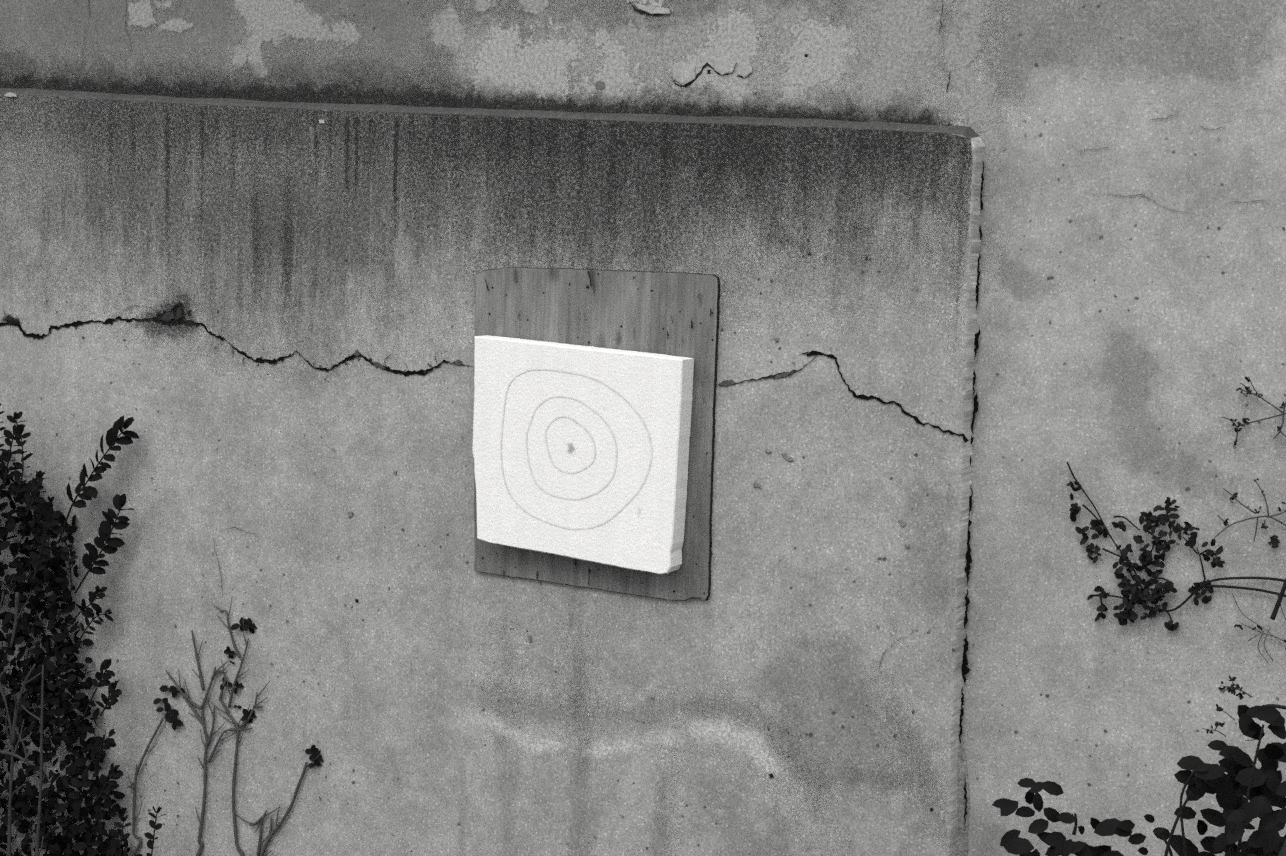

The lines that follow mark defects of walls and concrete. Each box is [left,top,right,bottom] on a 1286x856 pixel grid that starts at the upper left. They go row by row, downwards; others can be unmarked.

peeling [232,0,361,78]
peeling [428,0,1007,201]
leakage [345,117,358,183]
crack [0,295,474,377]
crack [718,160,984,825]